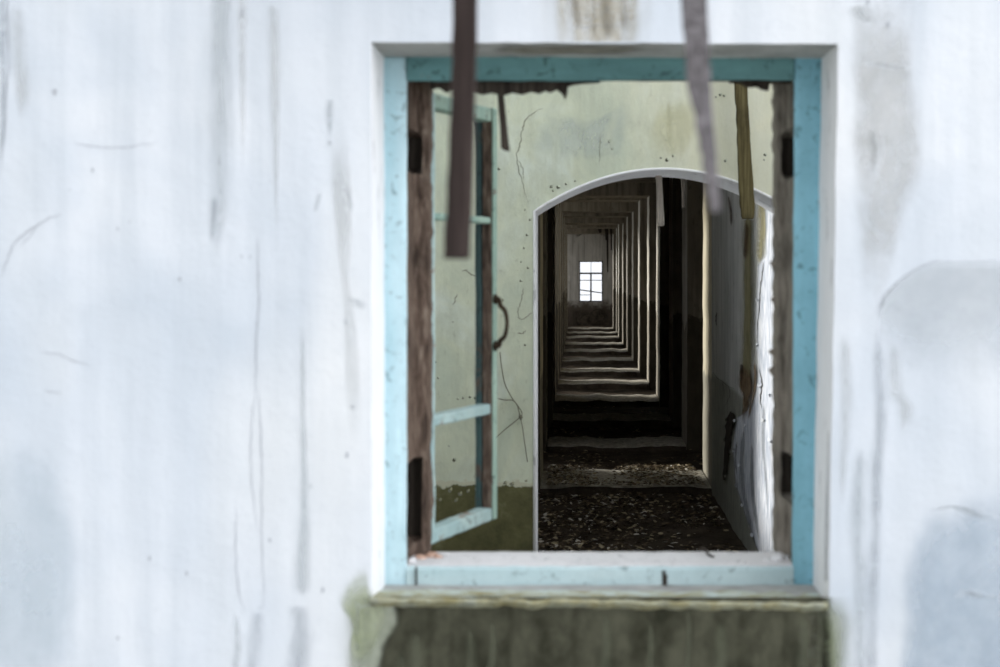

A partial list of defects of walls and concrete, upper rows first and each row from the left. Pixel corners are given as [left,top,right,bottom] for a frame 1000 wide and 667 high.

crack [516,108,543,203]
leakage [379,597,830,667]